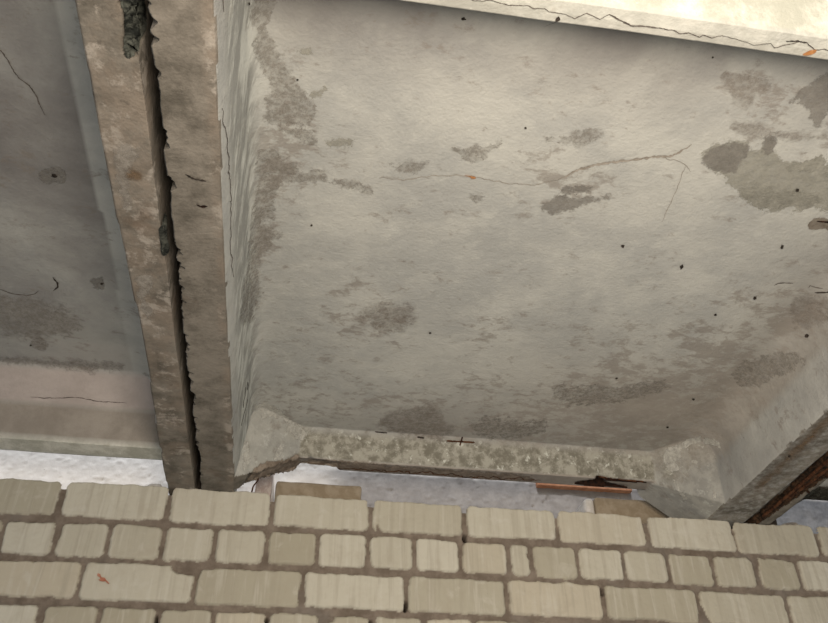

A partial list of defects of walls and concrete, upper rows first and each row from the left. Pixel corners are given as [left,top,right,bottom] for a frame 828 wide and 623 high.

crack [0,50,45,115]
damp [789,74,828,127]
crack [222,108,234,277]
crack [382,145,691,220]
damp [541,185,609,215]
damp [702,136,828,213]
spalling [808,218,828,230]